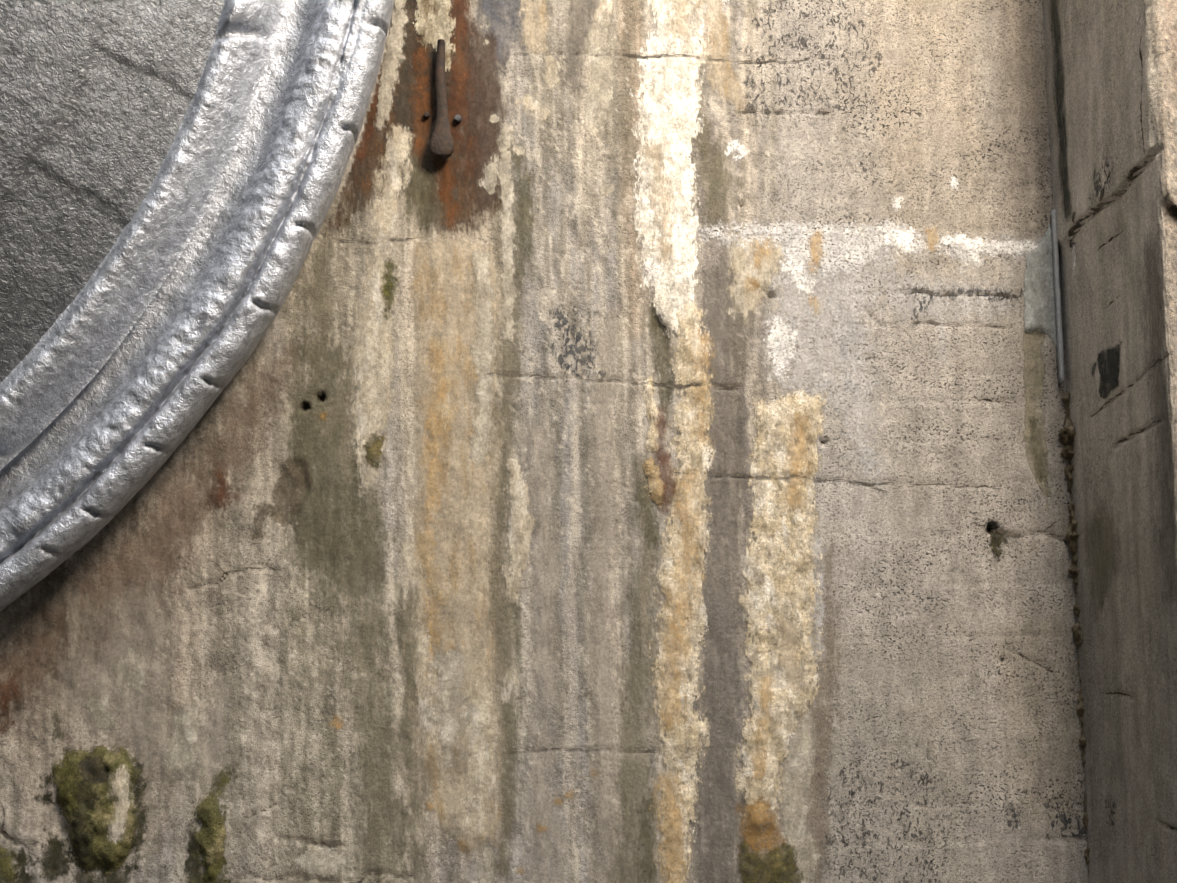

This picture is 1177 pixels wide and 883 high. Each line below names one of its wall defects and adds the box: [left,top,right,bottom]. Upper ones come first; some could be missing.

rust [329,0,502,233]
leakage [287,0,615,883]
leakage [631,0,1040,883]
crack [990,520,1067,556]